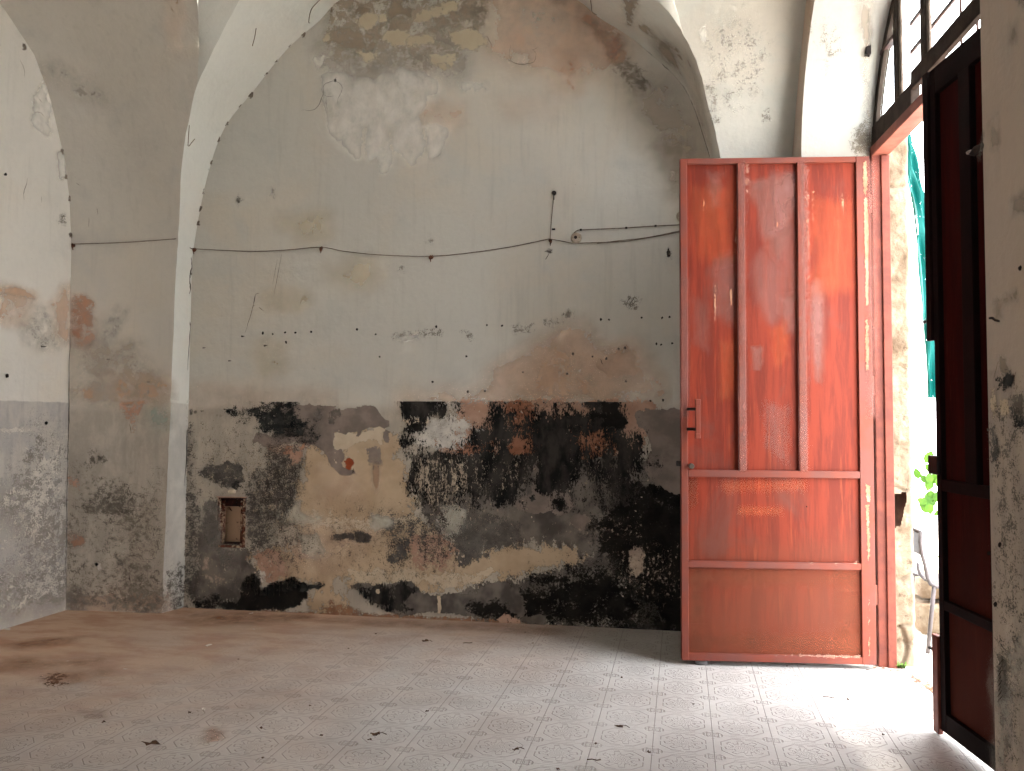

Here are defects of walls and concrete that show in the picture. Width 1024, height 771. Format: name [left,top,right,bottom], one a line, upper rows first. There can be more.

flaking render [355,0,488,71]
damp [403,411,483,453]
damp [4,402,323,613]
flaking render [193,395,681,625]
damp [439,509,465,531]